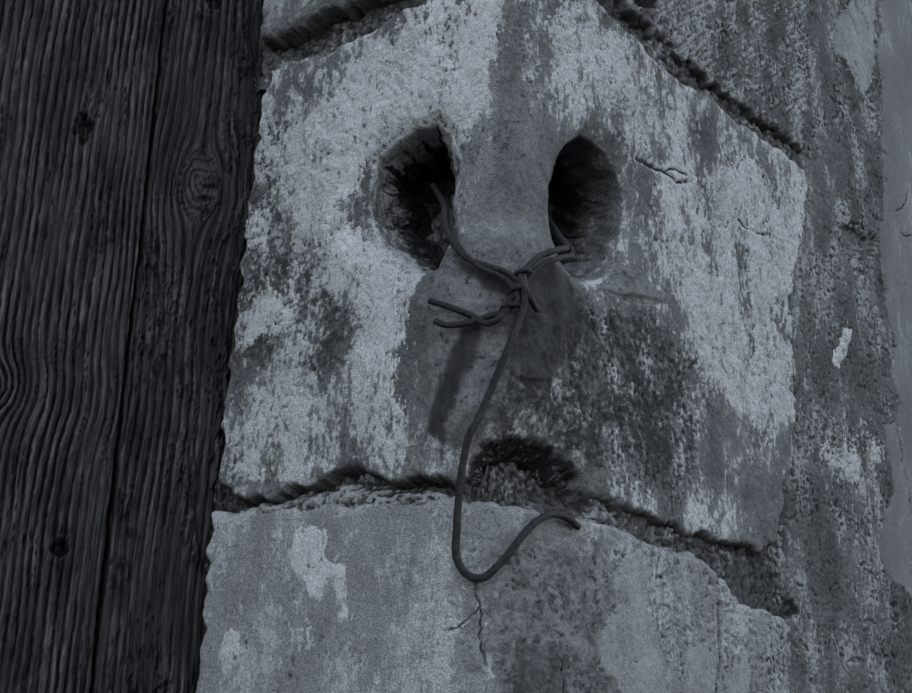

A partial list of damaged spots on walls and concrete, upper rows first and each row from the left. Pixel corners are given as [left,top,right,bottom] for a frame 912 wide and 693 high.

crack [638,161,686,184]
crack [443,585,486,665]